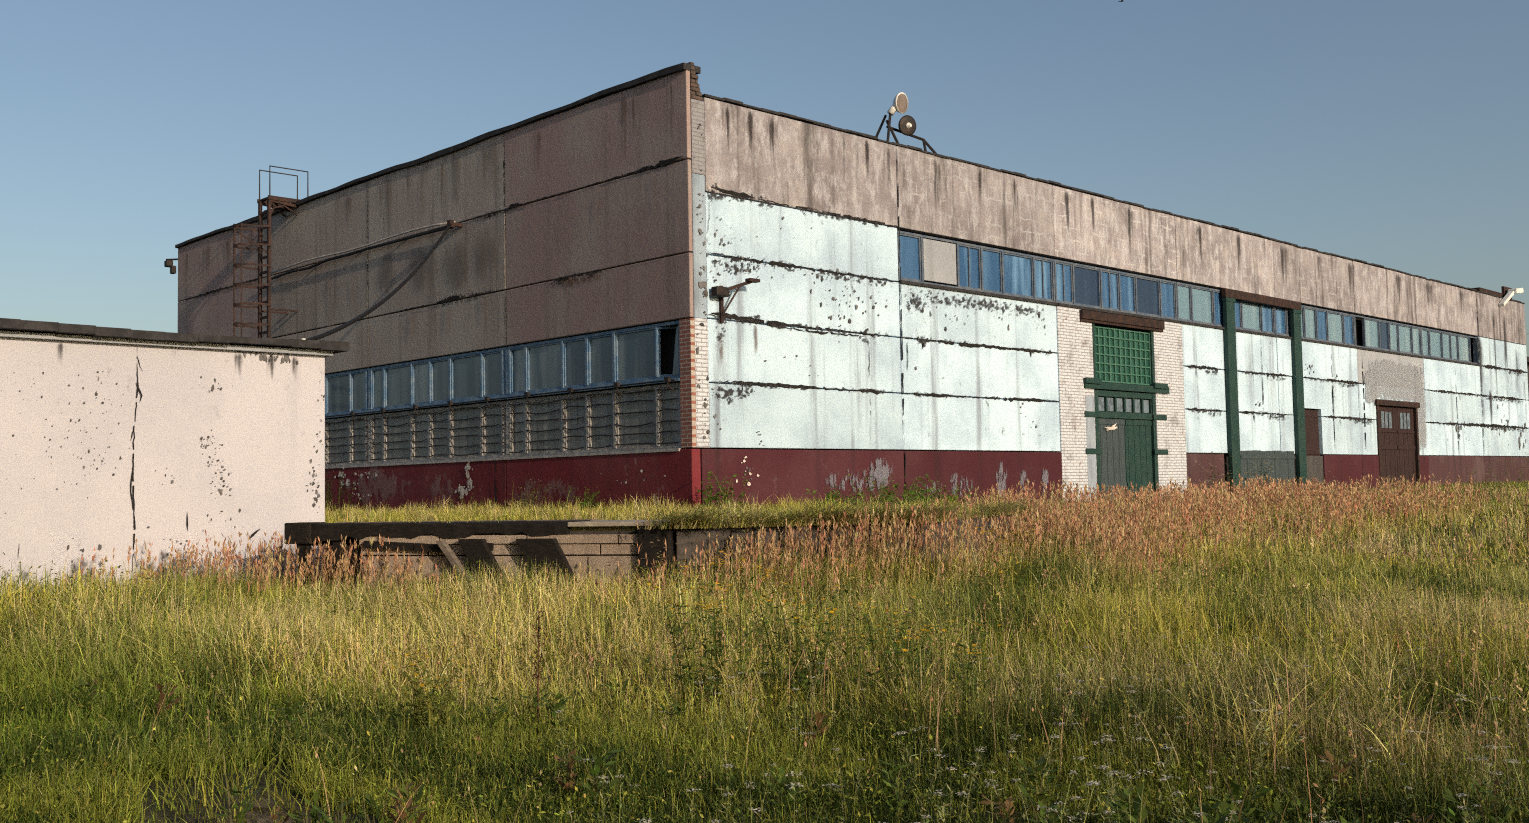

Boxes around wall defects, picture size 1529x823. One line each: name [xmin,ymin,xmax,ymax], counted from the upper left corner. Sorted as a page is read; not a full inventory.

water stain [748,112,774,148]
peeling [804,268,888,323]
crack [130,356,143,571]
peeling [306,380,406,507]
peeling [431,460,474,504]